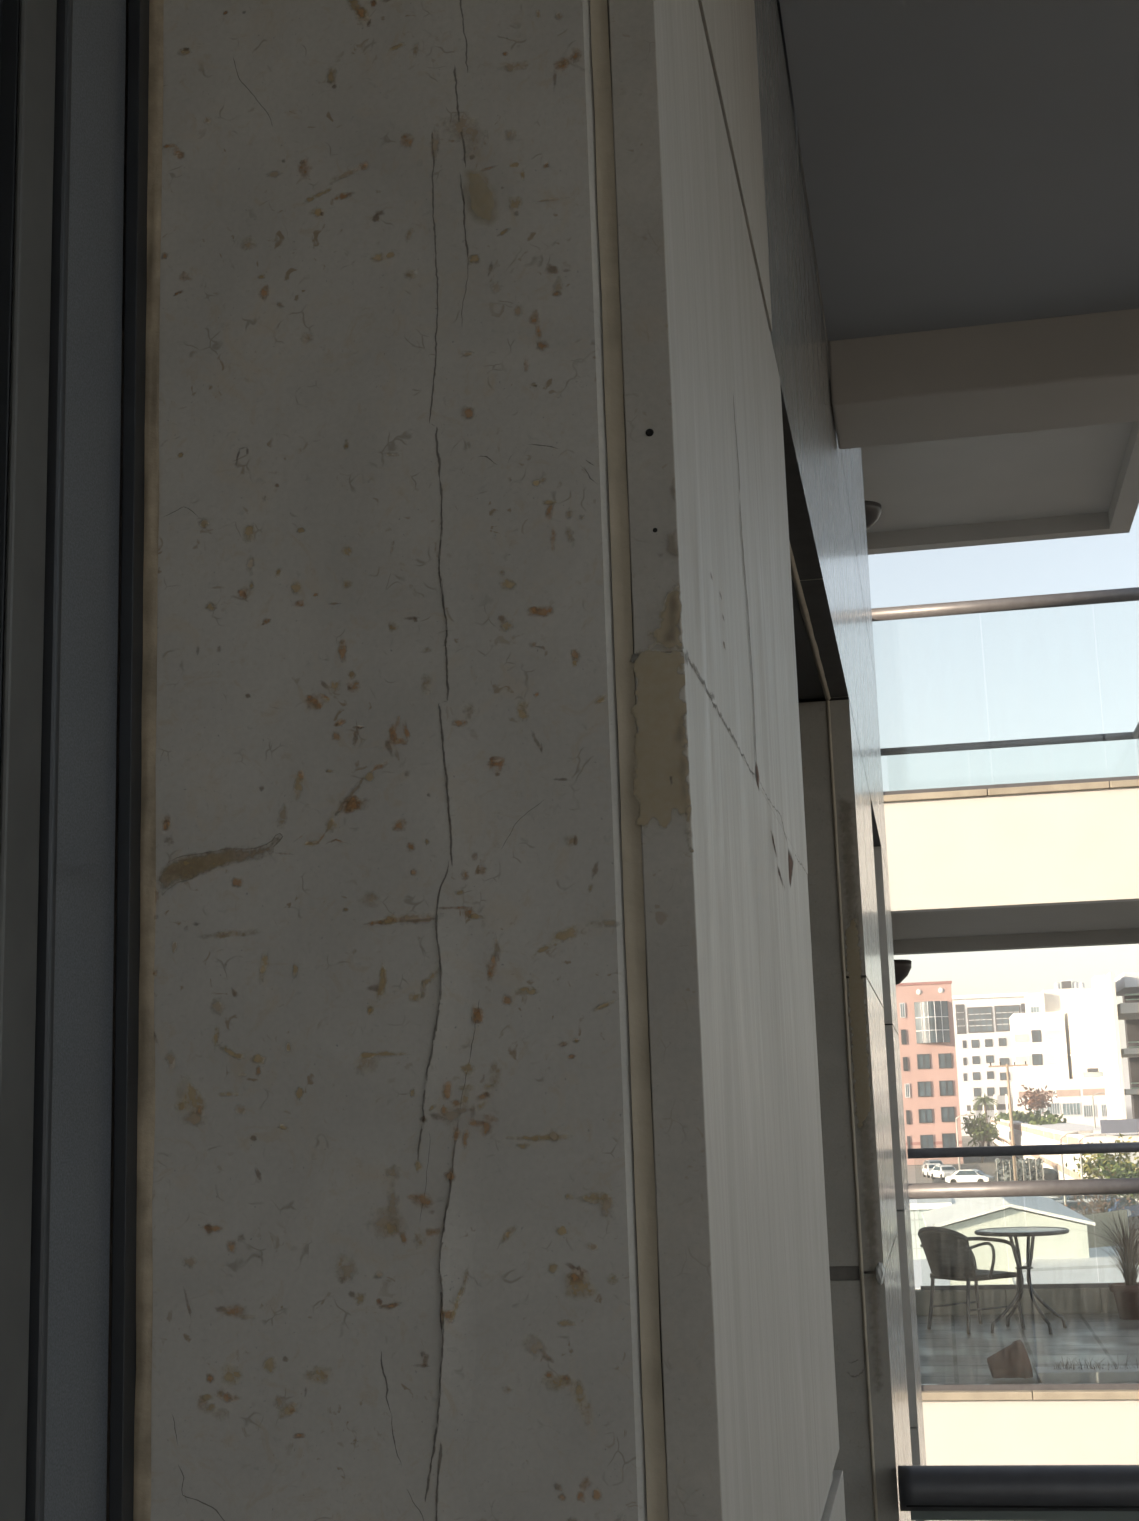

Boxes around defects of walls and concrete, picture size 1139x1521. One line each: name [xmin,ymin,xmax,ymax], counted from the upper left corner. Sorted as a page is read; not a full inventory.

crack [381,0,479,1521]
peeling [631,591,691,827]
crack [685,396,808,875]